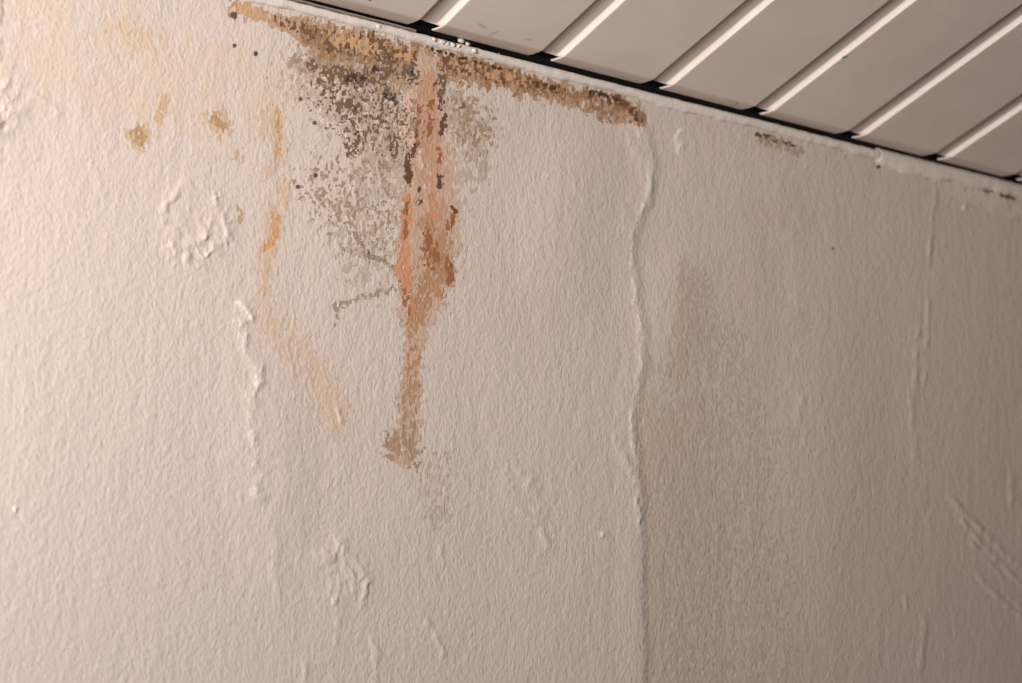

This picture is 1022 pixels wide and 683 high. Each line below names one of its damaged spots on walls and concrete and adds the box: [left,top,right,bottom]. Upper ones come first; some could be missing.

leakage [0,0,647,327]
corrosion [380,46,472,473]